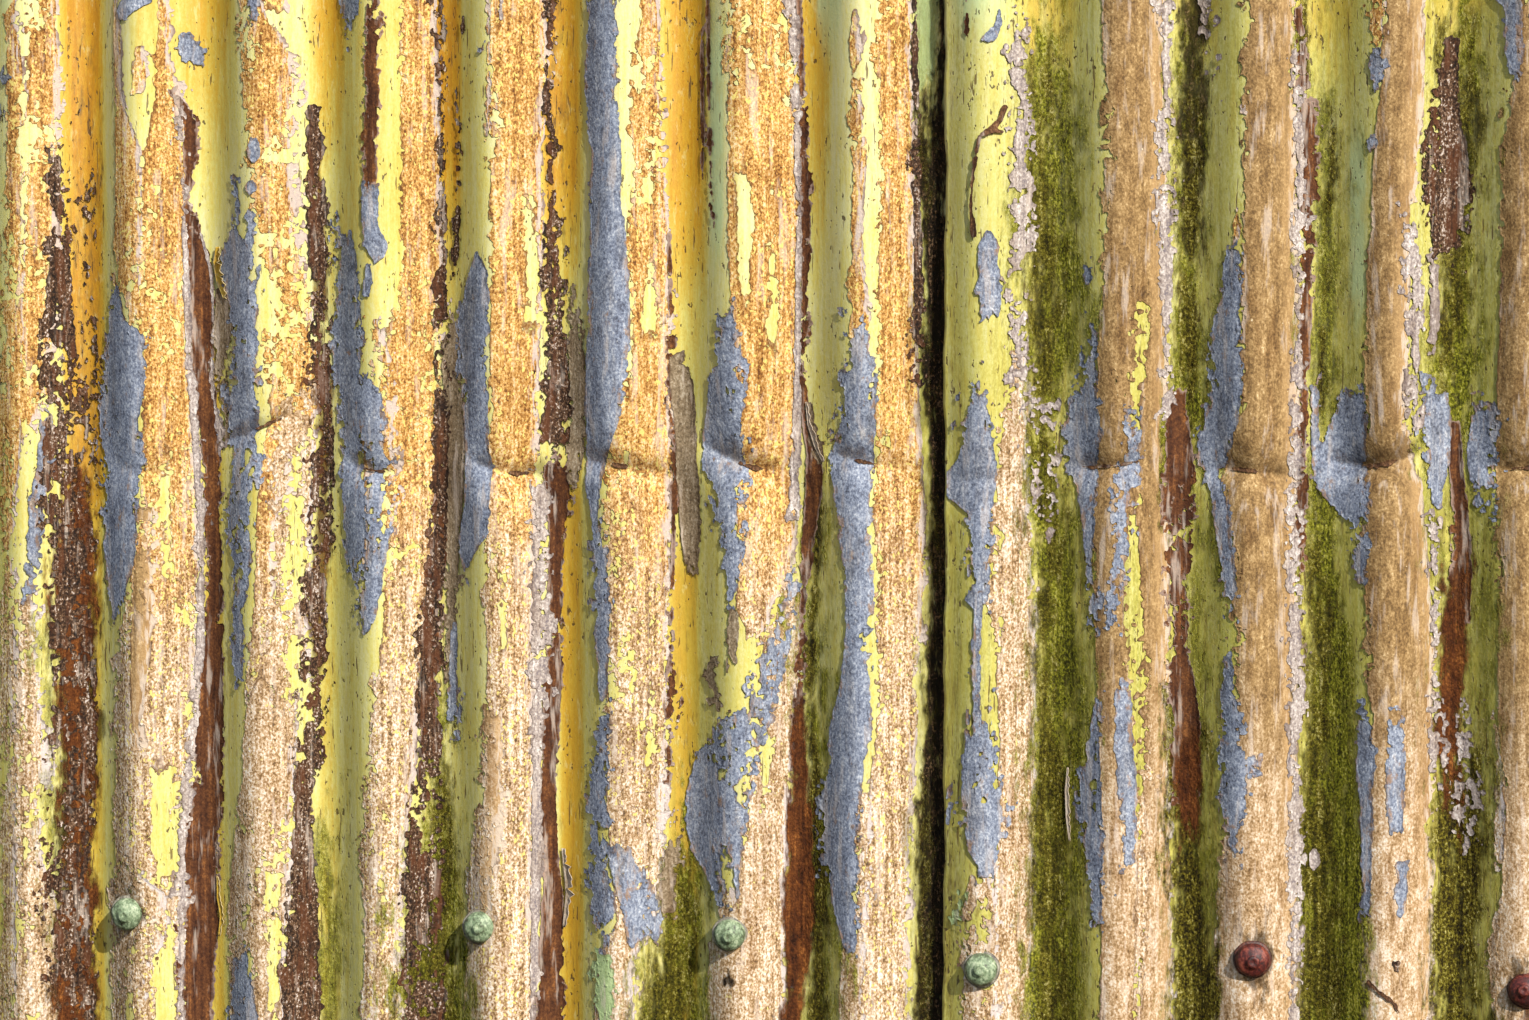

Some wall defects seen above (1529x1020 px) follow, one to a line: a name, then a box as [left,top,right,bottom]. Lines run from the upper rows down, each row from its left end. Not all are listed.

rust [46,449,103,1020]
rust [168,85,227,1020]
rust [416,493,447,697]
peeling [0,0,932,1020]
rust [779,0,823,1020]
peeling [946,345,1040,1020]
water stain [1000,4,1063,544]
rust [1159,388,1203,850]
peeling [1193,0,1529,1020]
rust [1432,421,1477,853]